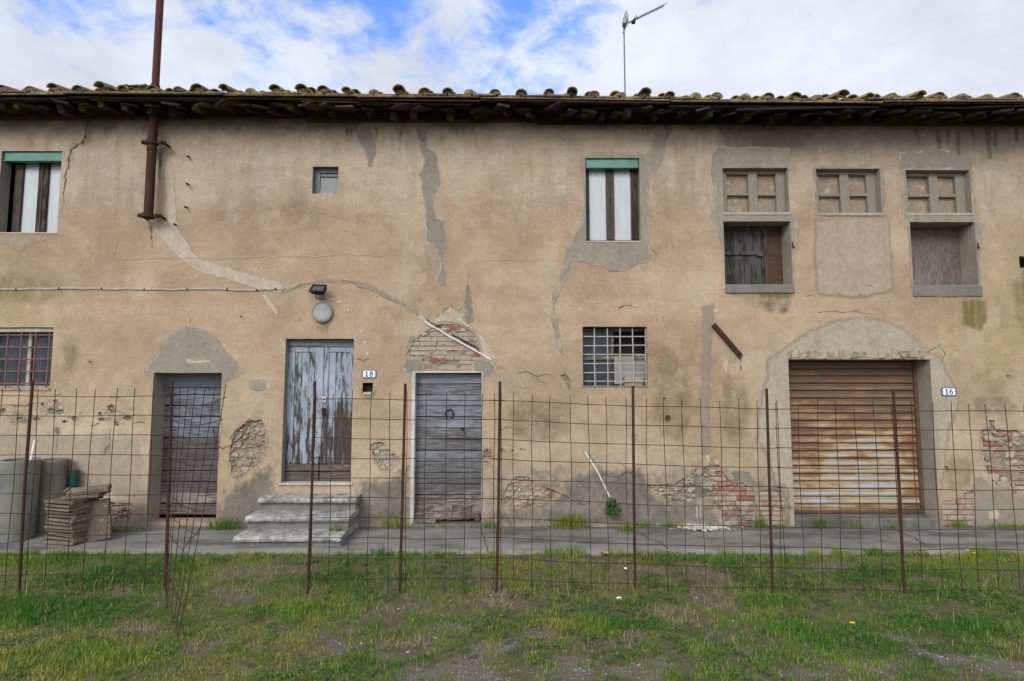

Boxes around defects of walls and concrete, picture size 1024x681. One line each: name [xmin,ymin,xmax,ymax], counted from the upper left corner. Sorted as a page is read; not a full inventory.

crack [61,122,88,212]
flaking render [405,307,498,371]
damp [964,301,986,327]
flaking render [227,418,268,481]
flaking render [369,441,401,472]
flaking render [979,419,1024,496]
flaking render [500,475,559,512]
flaking render [646,454,787,527]
flaking render [941,489,975,527]